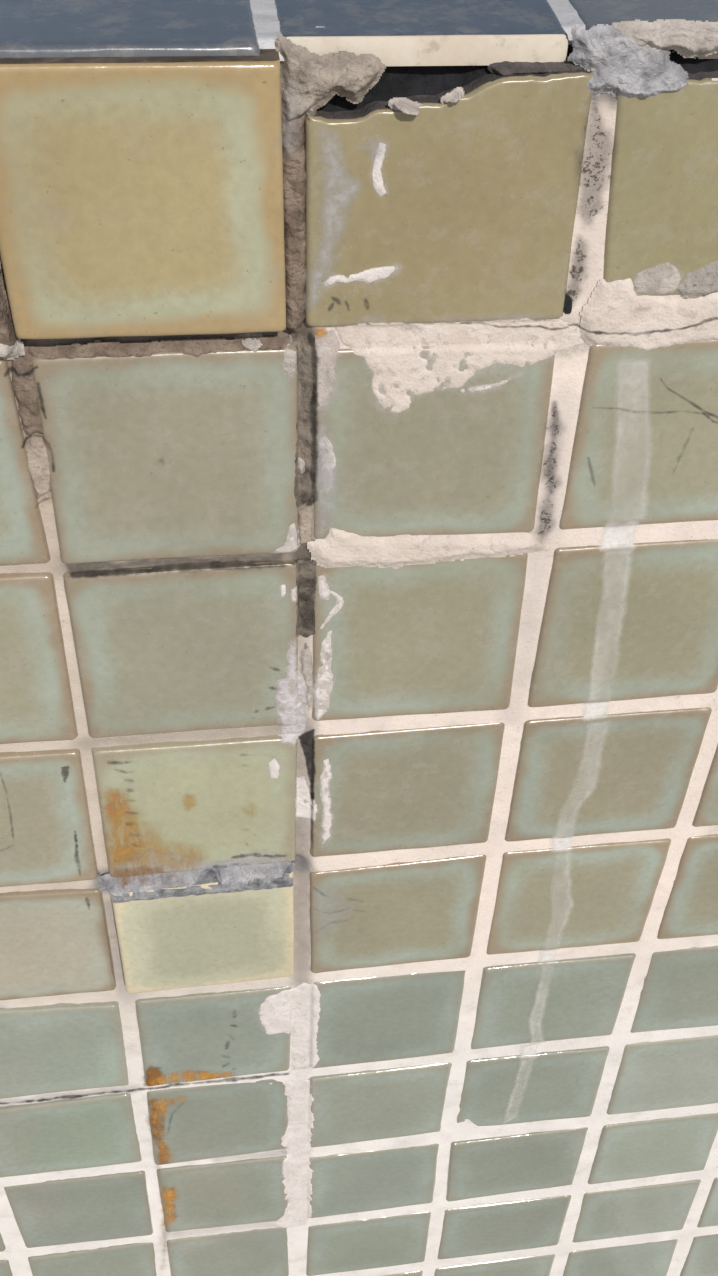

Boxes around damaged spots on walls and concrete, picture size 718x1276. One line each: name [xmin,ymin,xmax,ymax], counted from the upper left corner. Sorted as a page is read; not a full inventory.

spalling [319,44,584,116]
spalling [669,50,718,81]
spalling [562,289,572,316]
crack [5,367,46,448]
rust [108,794,158,881]
rust [146,1067,230,1086]
rust [152,1101,169,1165]
rust [162,1188,176,1222]